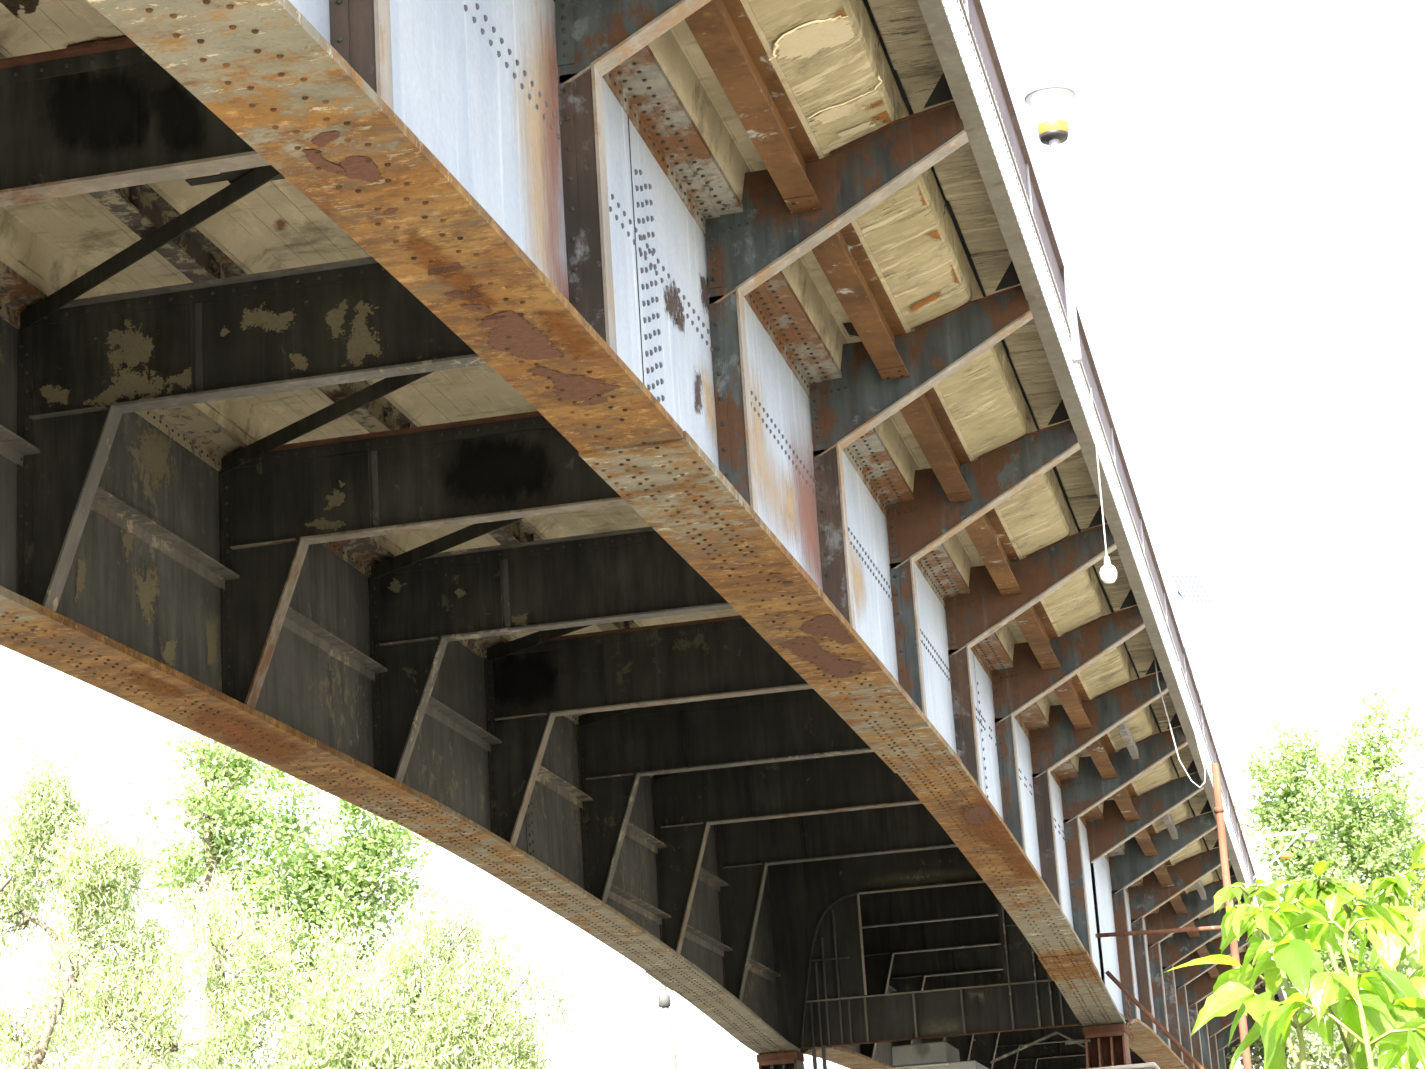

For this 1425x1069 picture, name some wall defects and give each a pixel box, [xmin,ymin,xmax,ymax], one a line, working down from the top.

damp [46,70,203,151]
corrosion [863,98,891,124]
corrosion [528,42,569,301]
peeling [40,319,191,408]
peeling [220,302,296,337]
peeling [289,351,309,372]
peeling [322,297,385,367]
corrosion [754,407,822,579]
corrosion [853,563,863,601]
corrosion [133,673,295,759]
corrosion [961,802,1038,878]